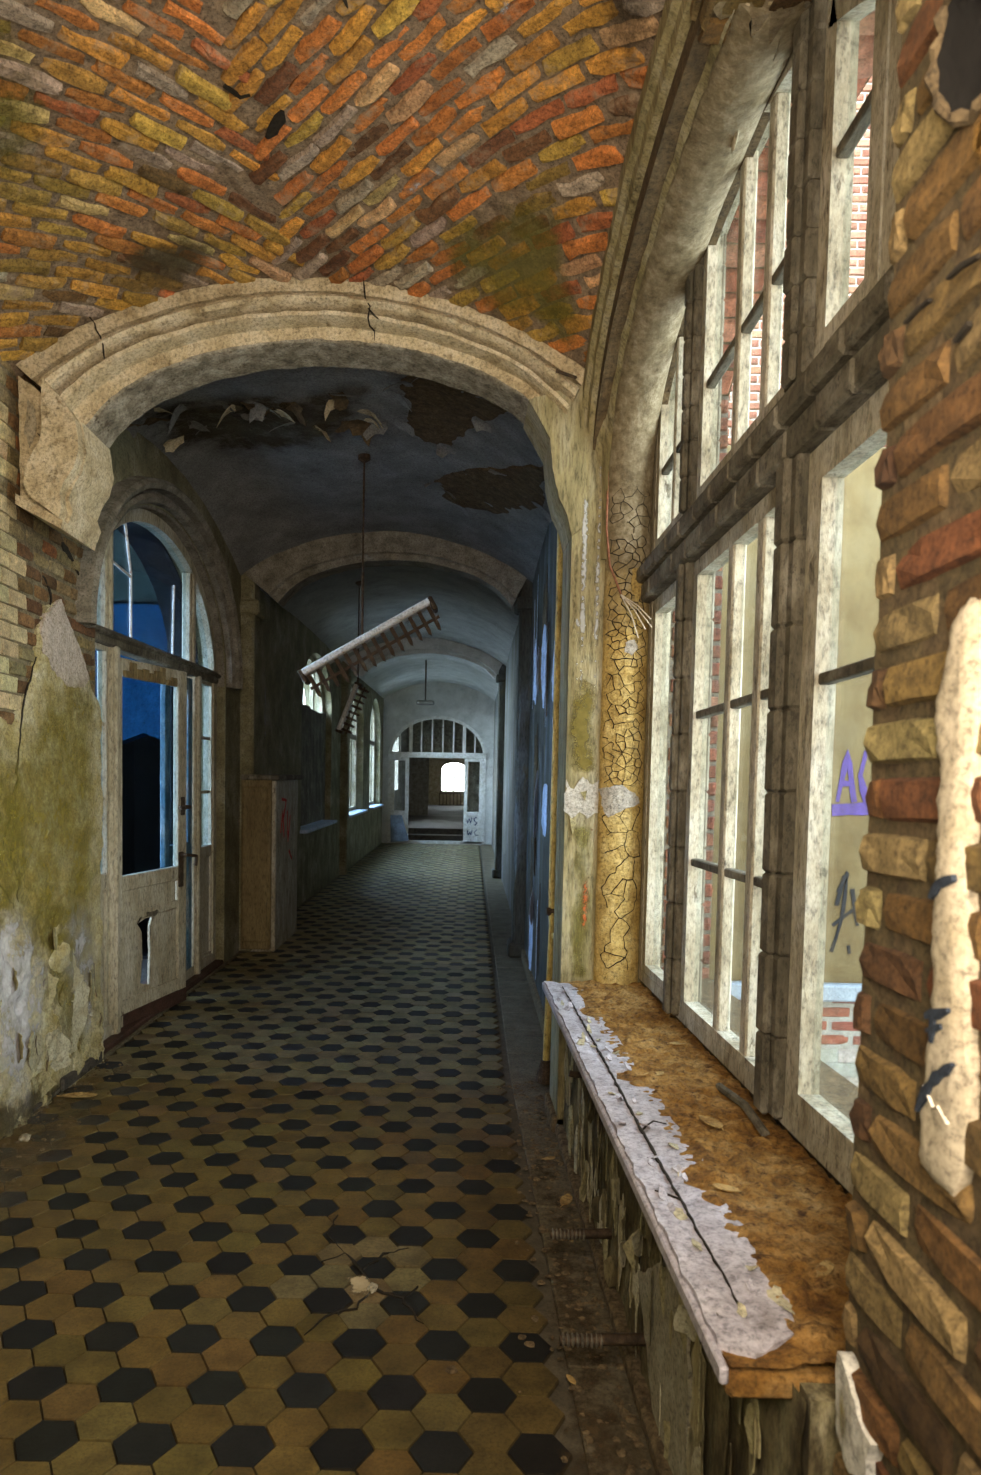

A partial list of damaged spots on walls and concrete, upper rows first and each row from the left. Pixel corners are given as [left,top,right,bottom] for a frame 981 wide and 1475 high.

spalling [924,0,981,128]
flaking render [126,375,552,523]
flaking render [39,599,89,688]
crack [600,487,651,970]
water stain [0,693,93,1073]
peeling [0,924,104,1099]
crack [304,1215,424,1336]
crack [562,986,738,1305]
peeling [557,988,761,1475]
peeling [716,1265,795,1319]